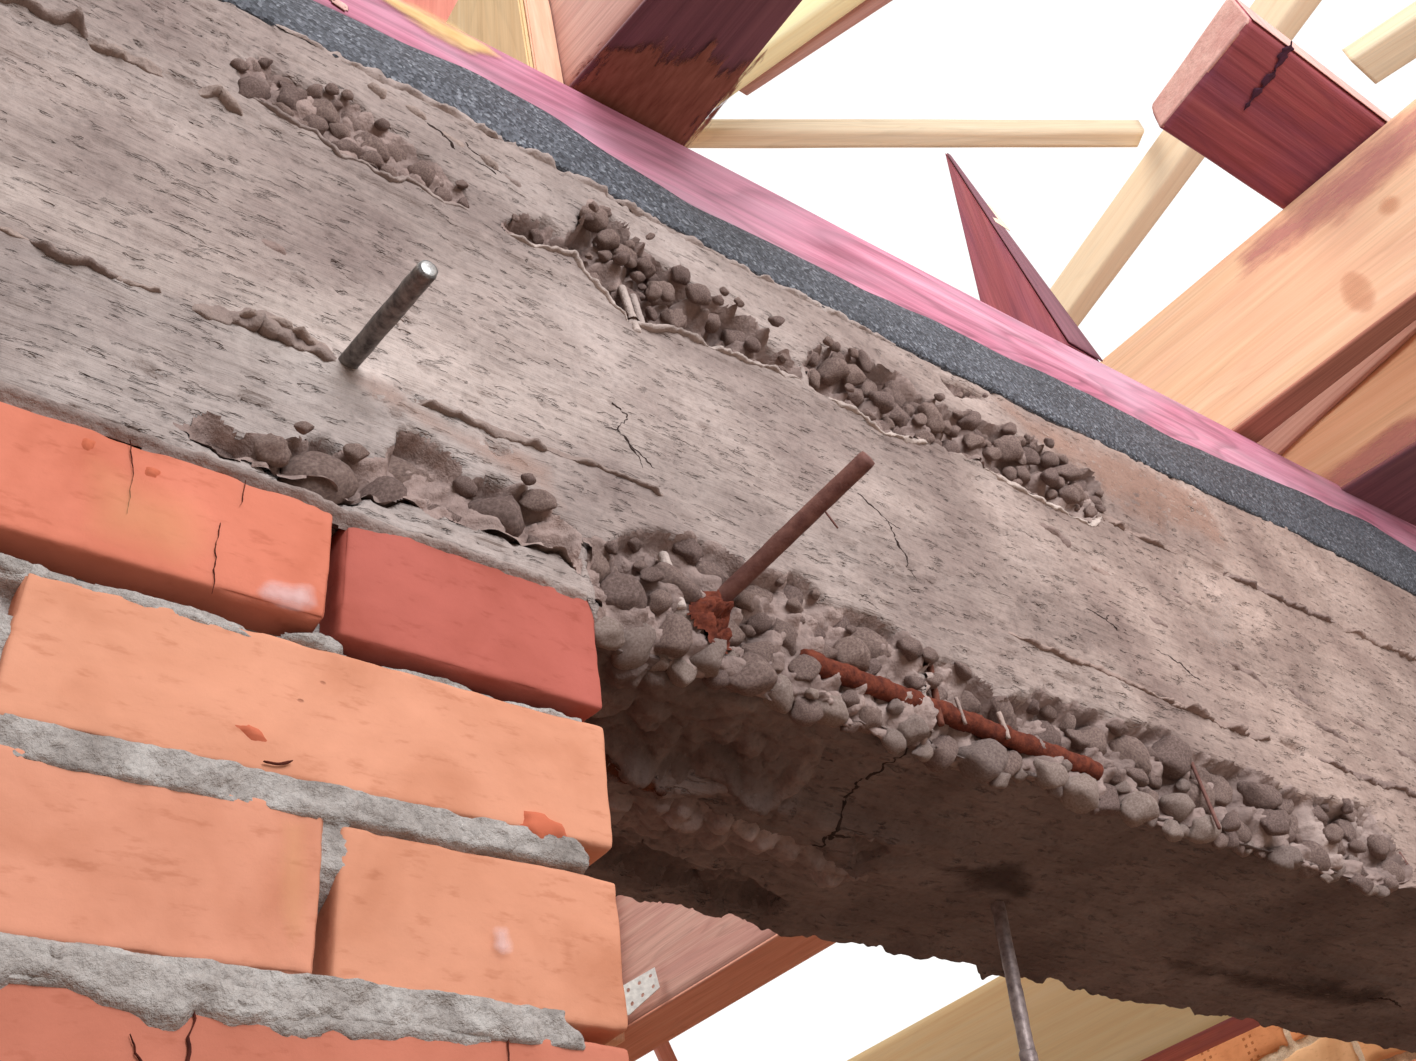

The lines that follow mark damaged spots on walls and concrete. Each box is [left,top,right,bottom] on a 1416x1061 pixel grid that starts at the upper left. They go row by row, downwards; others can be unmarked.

peeling [367,82,387,99]
peeling [442,131,521,187]
peeling [501,429,664,496]
crack [212,480,246,593]
corrosion [687,451,875,654]
peeling [1041,523,1071,548]
peeling [1170,703,1271,741]
peeling [1287,687,1381,743]
crack [812,748,909,848]
spalling [593,836,770,913]
crack [129,1033,142,1061]
crack [185,1011,197,1061]